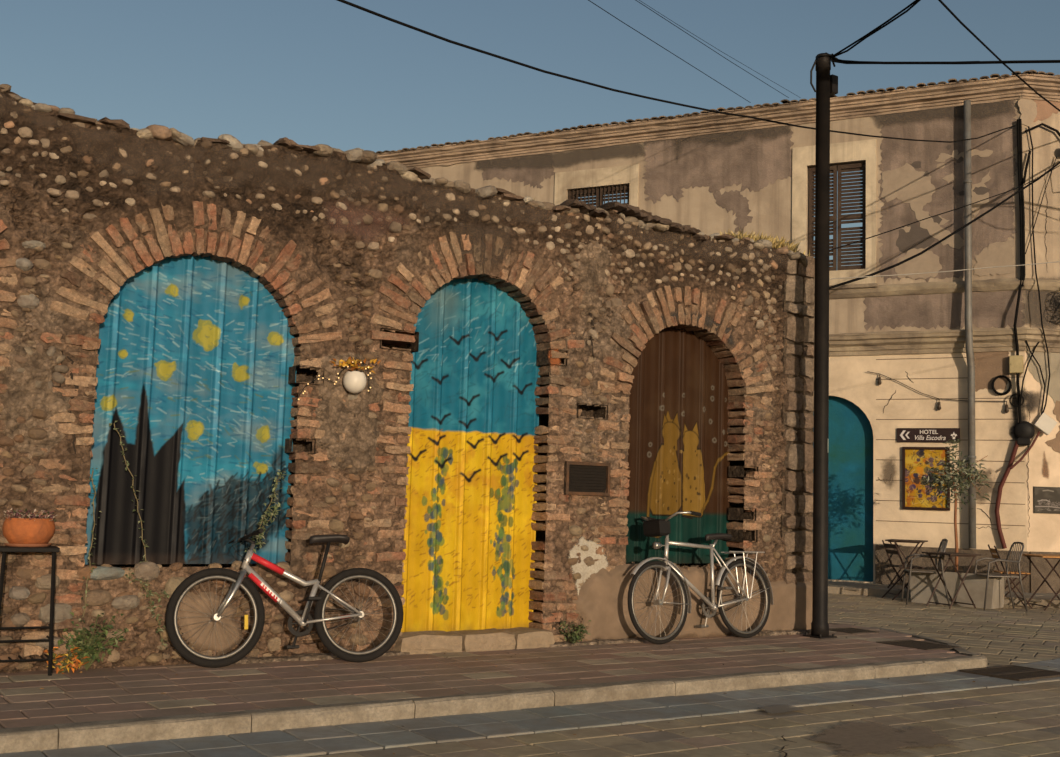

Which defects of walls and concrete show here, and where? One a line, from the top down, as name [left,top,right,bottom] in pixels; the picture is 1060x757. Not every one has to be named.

flaking render [482,153,556,189]
flaking render [642,129,794,233]
flaking render [863,97,1060,331]